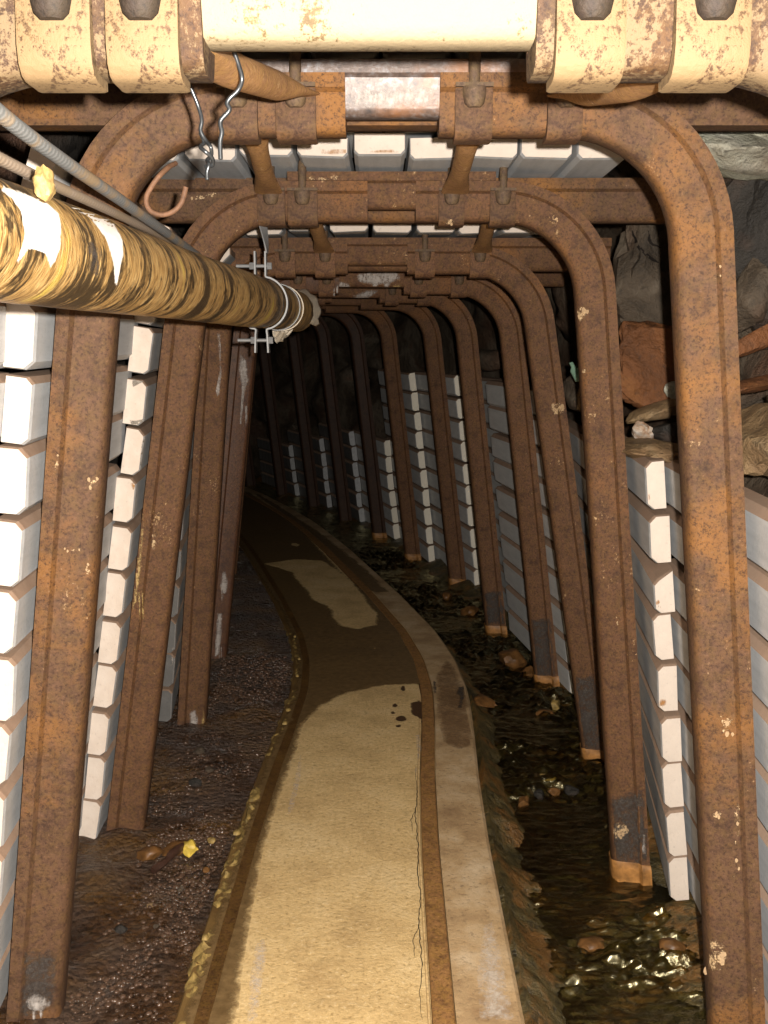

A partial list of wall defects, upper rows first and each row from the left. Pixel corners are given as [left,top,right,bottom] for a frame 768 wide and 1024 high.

water stain [185,493,422,1024]
crack [410,768,423,1020]
rust [703,939,726,975]